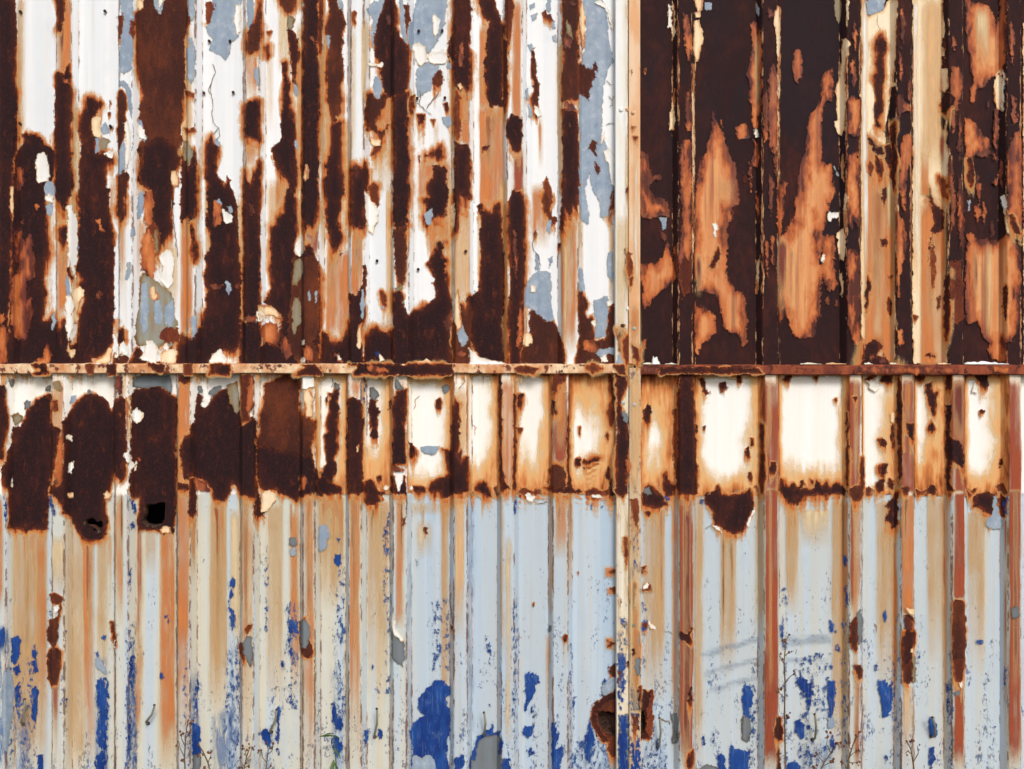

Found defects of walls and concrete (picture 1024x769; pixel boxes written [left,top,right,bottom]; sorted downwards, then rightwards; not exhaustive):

peeling [91,191,198,471]
peeling [206,0,255,60]
corrosion [0,0,643,743]
peeling [512,230,554,351]
peeling [529,0,615,225]
peeling [582,296,623,364]
corrosion [697,244,721,282]
corrosion [854,3,904,365]
corrosion [912,2,1010,365]
corrosion [605,365,1022,769]
peeling [410,755,436,769]
corrosion [590,663,622,768]